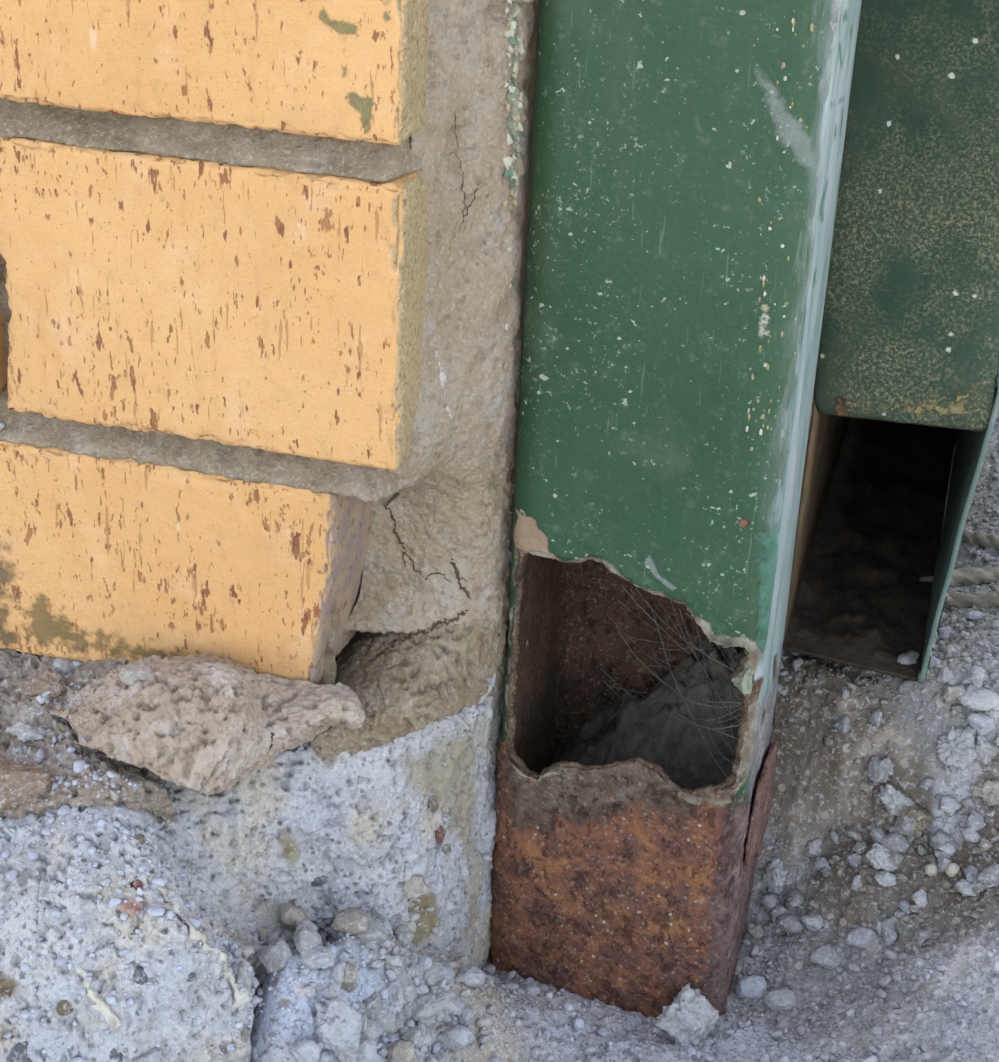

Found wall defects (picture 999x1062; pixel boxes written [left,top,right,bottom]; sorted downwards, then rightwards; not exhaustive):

peeling [503,0,525,213]
leakage [0,561,165,659]
crack [365,493,471,665]
corrosion [489,549,778,1018]